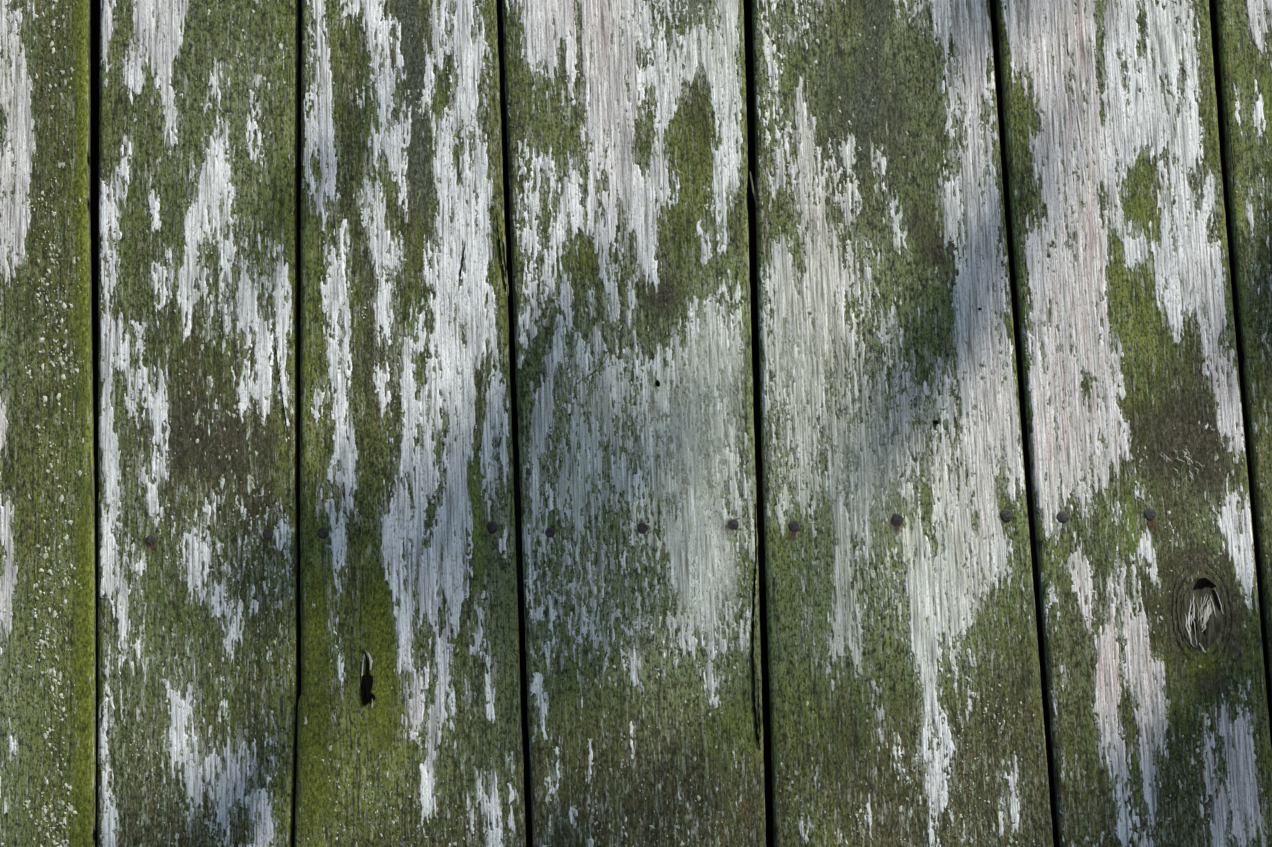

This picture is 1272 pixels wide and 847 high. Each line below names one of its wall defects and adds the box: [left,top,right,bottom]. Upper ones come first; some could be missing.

peeling [0,0,75,299]
water stain [1263,78,1271,137]
peeling [0,396,36,660]
peeling [87,0,520,847]
peeling [505,0,1272,847]
peeling [0,677,23,845]
water stain [302,601,329,822]
water stain [370,583,392,740]